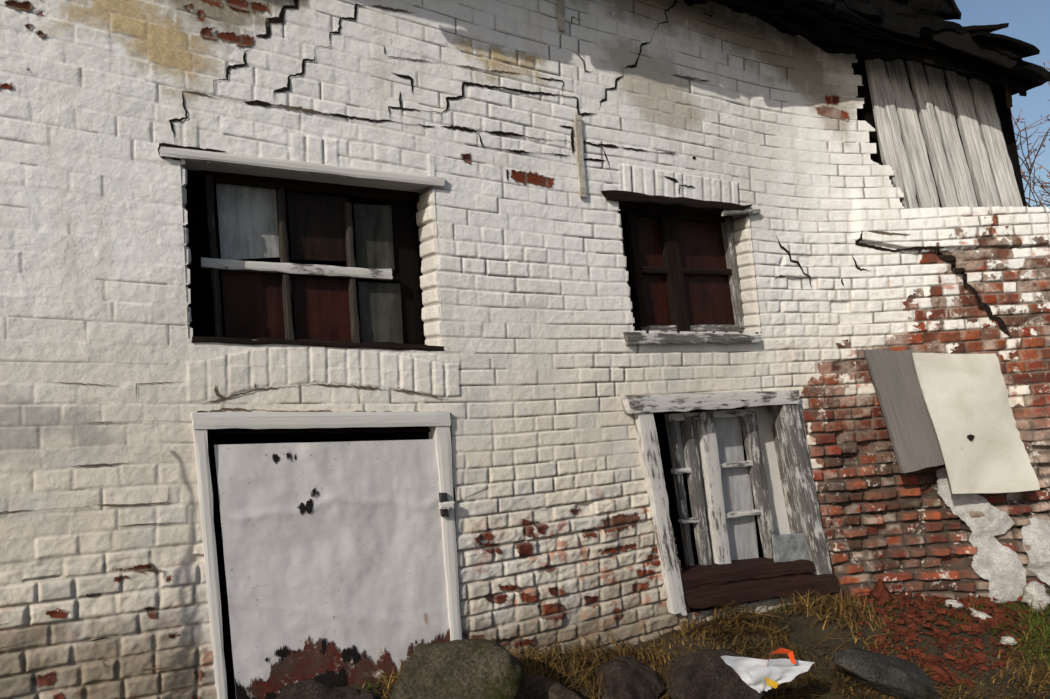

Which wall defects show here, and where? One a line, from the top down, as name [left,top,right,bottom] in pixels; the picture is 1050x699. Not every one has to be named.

peeling [185,0,271,48]
crack [158,0,696,194]
crack [673,74,709,82]
peeling [816,94,849,122]
peeling [511,169,554,188]
crack [775,236,812,288]
crack [841,230,1011,338]
spalling [799,210,1050,603]
peeling [474,519,548,559]
peeling [581,512,653,538]
peeling [632,545,661,594]
peeling [485,584,567,621]